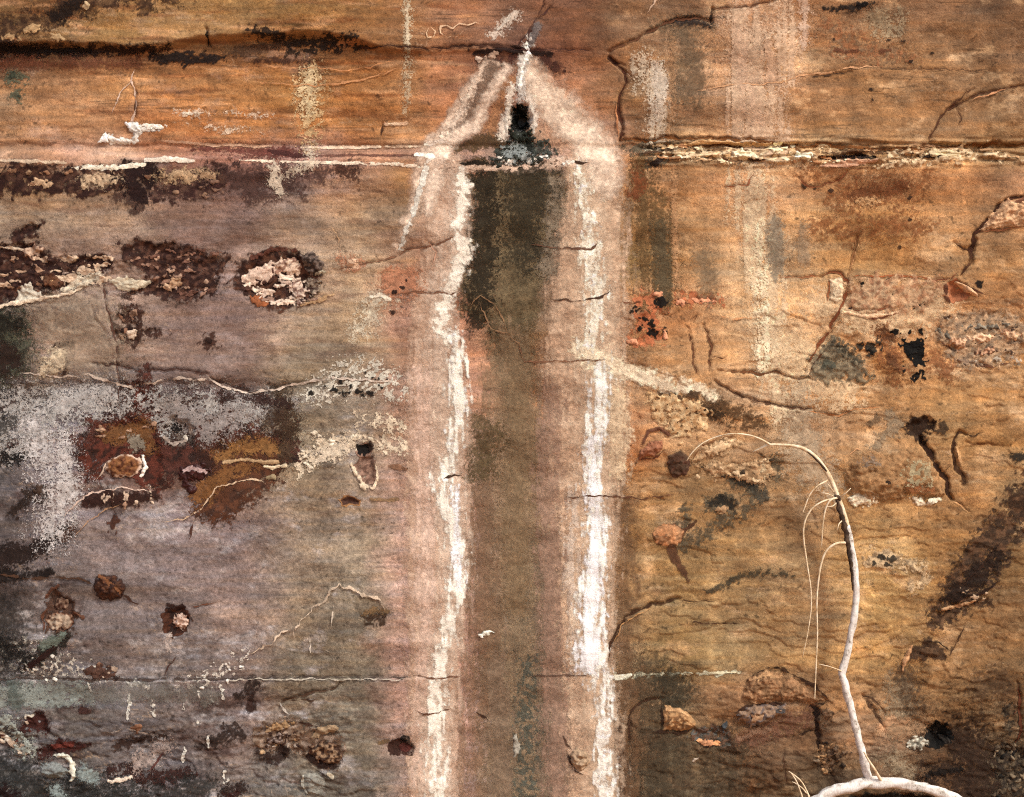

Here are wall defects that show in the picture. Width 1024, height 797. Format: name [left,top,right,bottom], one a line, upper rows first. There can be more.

crack [359,0,1024,188]
water stain [0,156,195,171]
spalling [817,148,941,167]
water stain [821,141,1019,170]
spalling [0,219,335,314]
crack [935,196,1022,281]
water stain [725,161,962,507]
water stain [0,305,278,584]
rust [56,361,311,543]
crack [920,431,1002,513]
water stain [925,448,1024,616]
spalling [251,715,347,772]